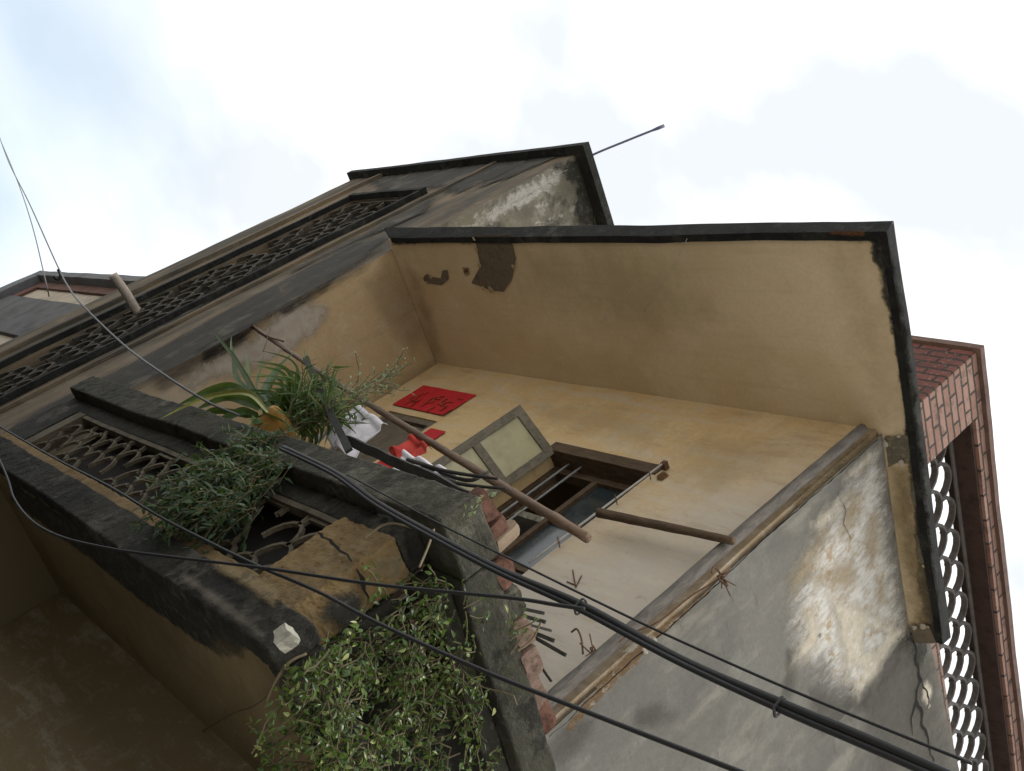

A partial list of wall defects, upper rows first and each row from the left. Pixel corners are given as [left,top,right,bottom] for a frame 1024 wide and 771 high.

leakage [92,155,596,389]
spalling [422,270,449,285]
spalling [472,235,516,293]
leakage [869,241,948,766]
crack [318,532,369,599]
crack [549,439,878,737]
crack [911,642,934,762]